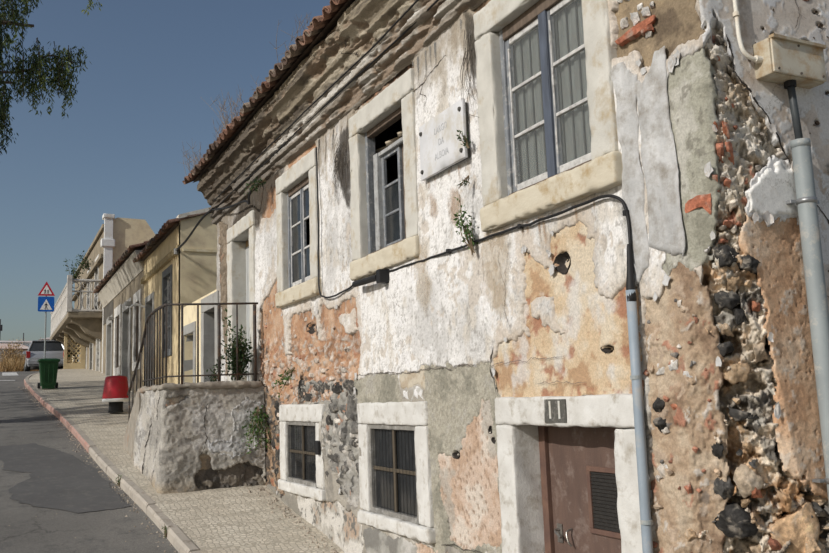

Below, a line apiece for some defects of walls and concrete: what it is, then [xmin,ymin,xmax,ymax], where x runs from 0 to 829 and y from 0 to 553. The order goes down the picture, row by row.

water stain [318,118,351,206]
spalling [491,0,829,553]
flaking render [194,281,364,553]
flaking render [438,398,502,550]